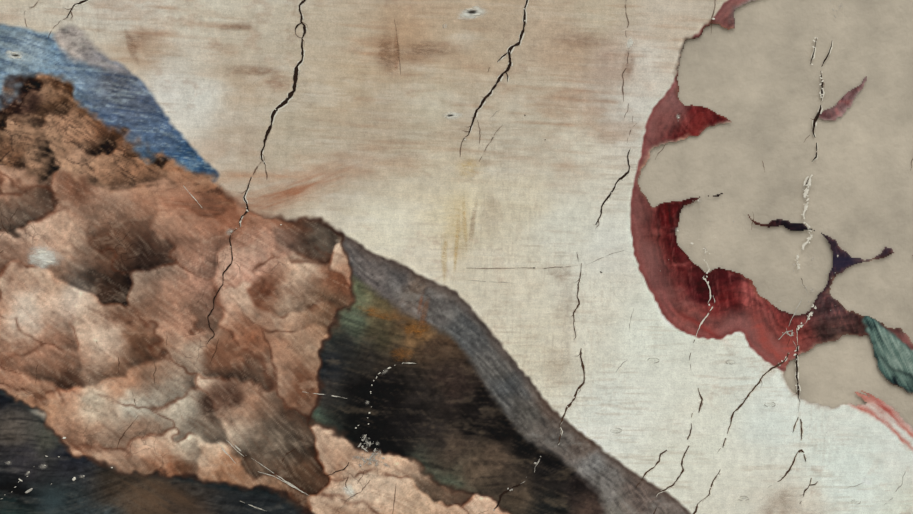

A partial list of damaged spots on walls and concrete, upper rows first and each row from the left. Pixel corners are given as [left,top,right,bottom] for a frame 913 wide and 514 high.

crack [48,0,90,38]
crack [460,0,529,161]
crack [207,0,308,363]
flaking render [788,175,817,330]
peeling [355,412,386,467]
crack [470,250,624,514]
crack [636,250,715,514]
crack [693,328,818,514]